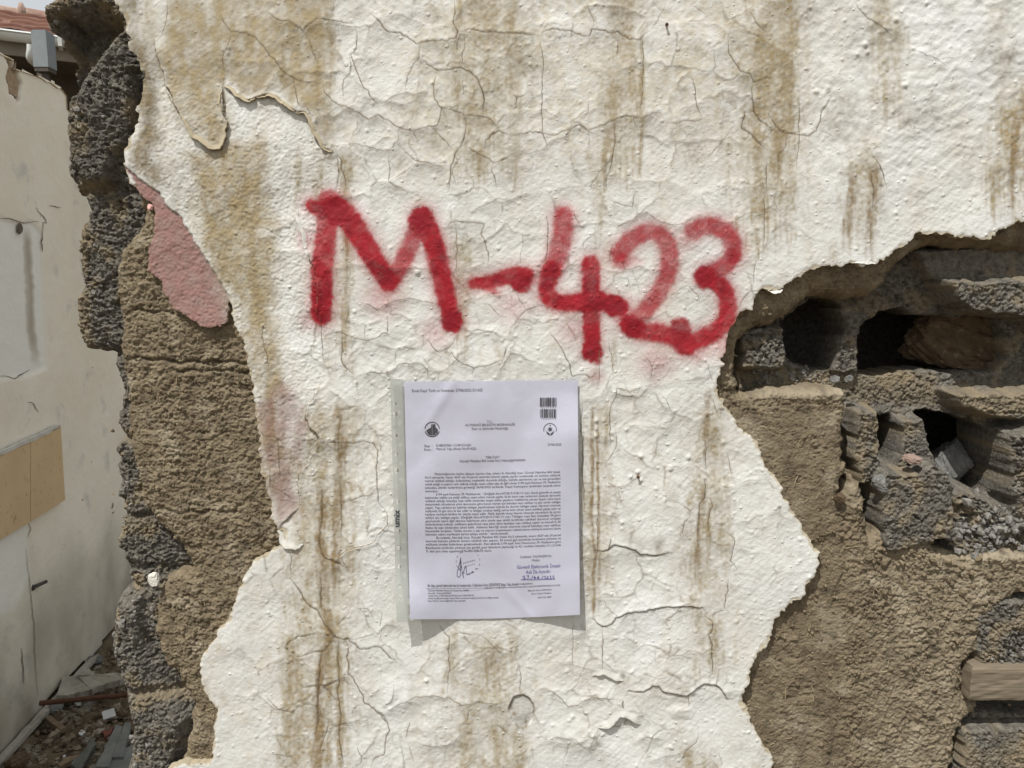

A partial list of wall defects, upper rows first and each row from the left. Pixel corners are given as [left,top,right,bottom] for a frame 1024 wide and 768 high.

damp [163,0,332,460]
peeling [180,85,333,152]
crack [204,7,705,282]
crack [712,44,829,230]
spalling [45,0,303,768]
damp [286,598,342,768]
damp [300,487,353,579]
damp [316,409,354,479]
crack [261,396,506,761]
crack [553,336,666,556]
crack [552,441,735,707]
spalling [716,222,1024,768]